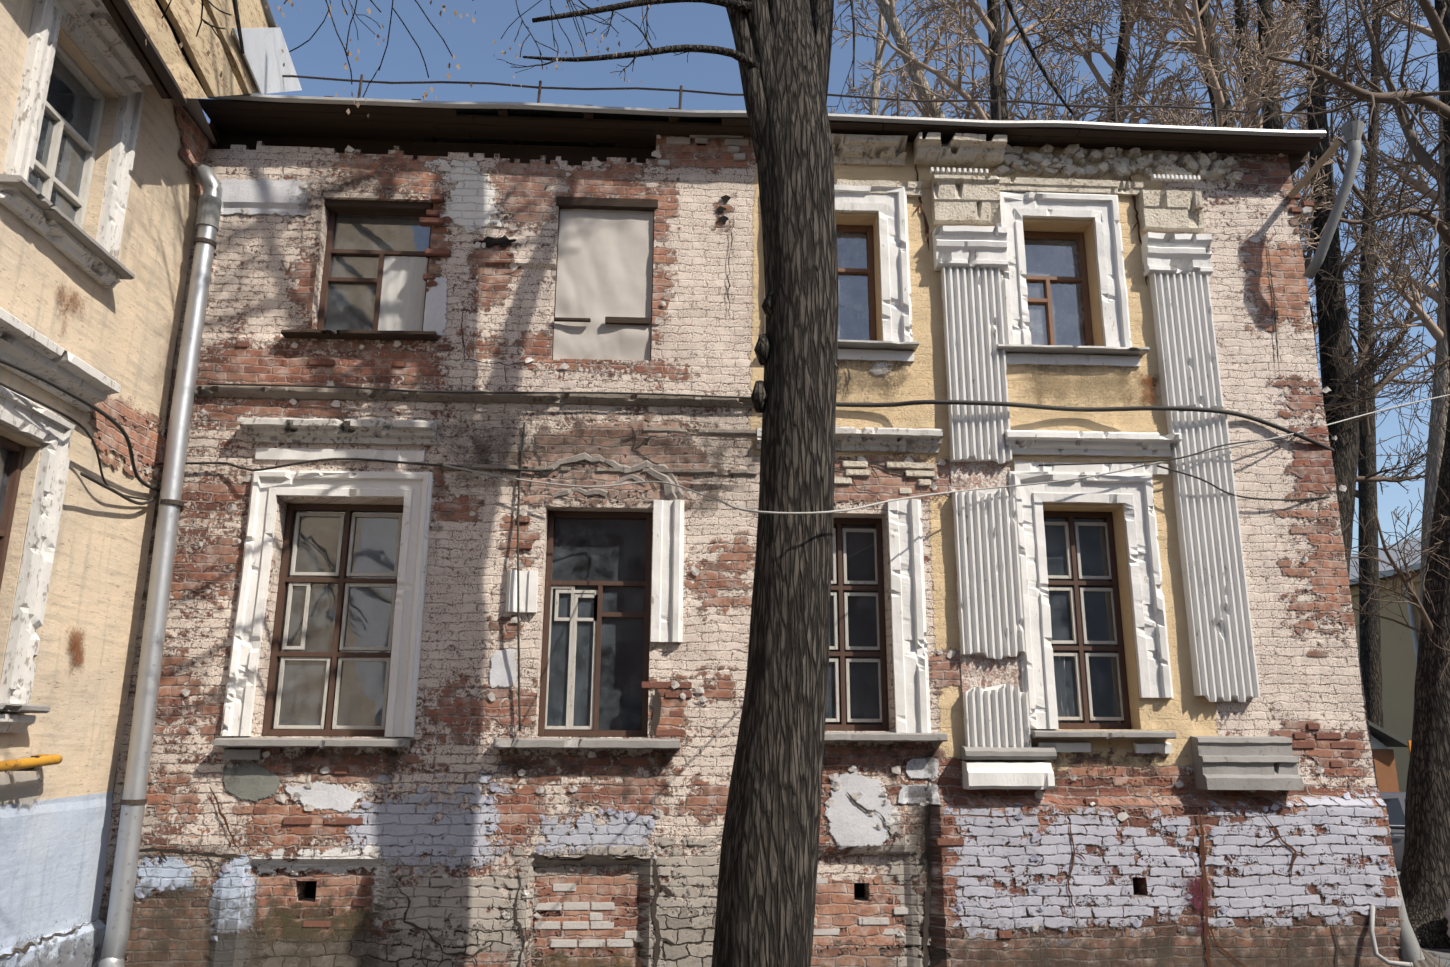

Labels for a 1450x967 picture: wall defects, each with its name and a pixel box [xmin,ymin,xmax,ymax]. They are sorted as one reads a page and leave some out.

flaking render [330,135,756,384]
flaking render [1222,153,1314,337]
flaking render [191,330,446,427]
flaking render [88,395,166,484]
flaking render [1267,374,1357,657]
rust [70,629,84,665]
flaking render [152,634,235,749]
peeling [124,666,742,967]
flaking render [819,741,949,852]
peeling [920,714,1404,967]
crack [0,919,97,958]
crack [393,854,675,967]